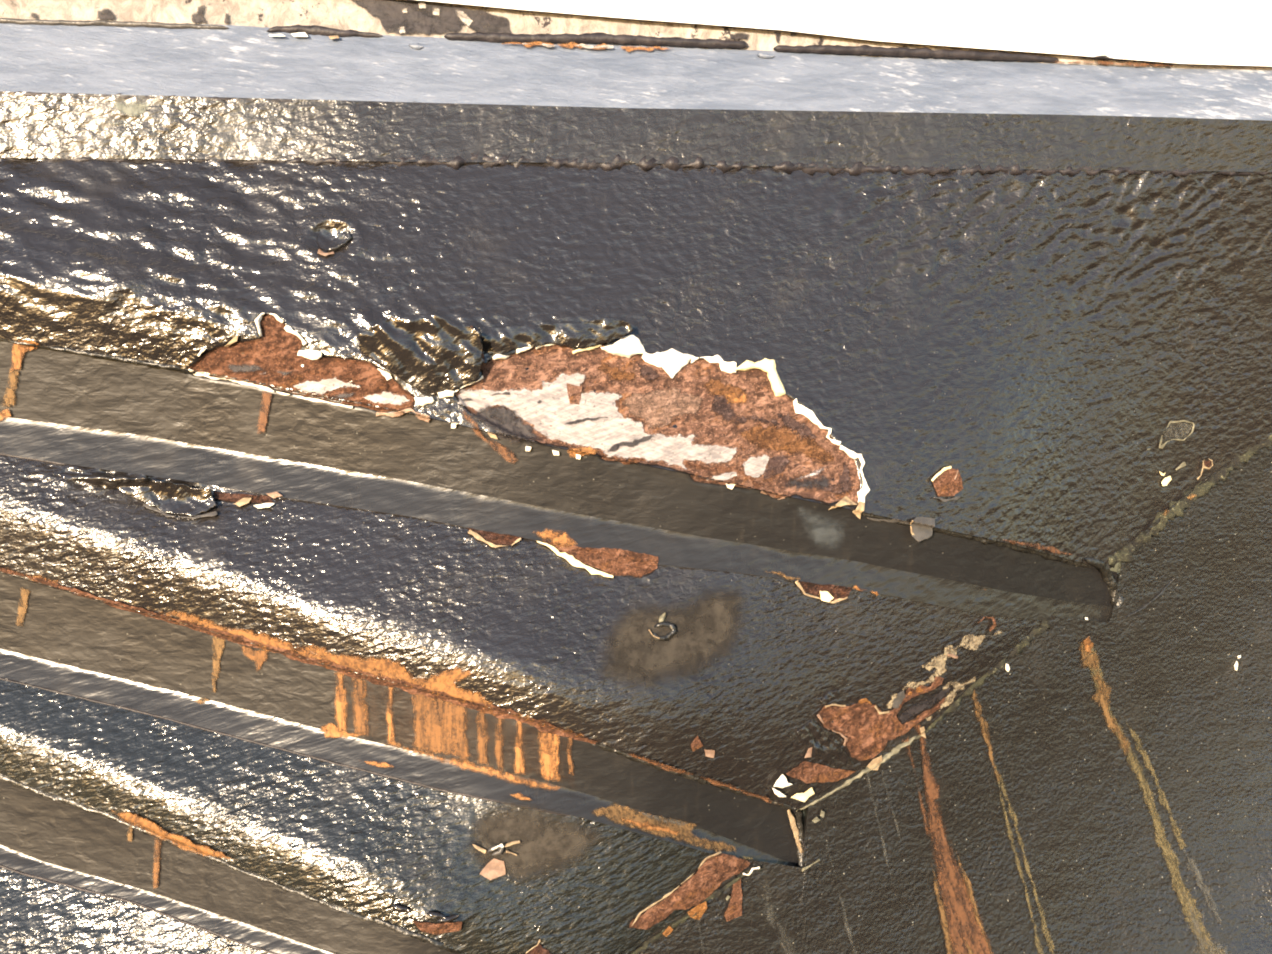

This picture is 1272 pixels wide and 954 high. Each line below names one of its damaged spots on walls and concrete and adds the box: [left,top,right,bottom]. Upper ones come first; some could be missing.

corrosion [0,340,38,420]
corrosion [0,567,597,800]
damp [472,807,598,880]
peeling [188,313,935,542]
peeling [537,530,658,578]
damp [606,595,740,682]
peeling [629,851,760,937]
peeling [773,617,1002,802]
peeling [931,466,963,502]
corrosion [904,724,992,954]
corrosion [973,689,1055,954]
corrosion [1081,637,1226,954]